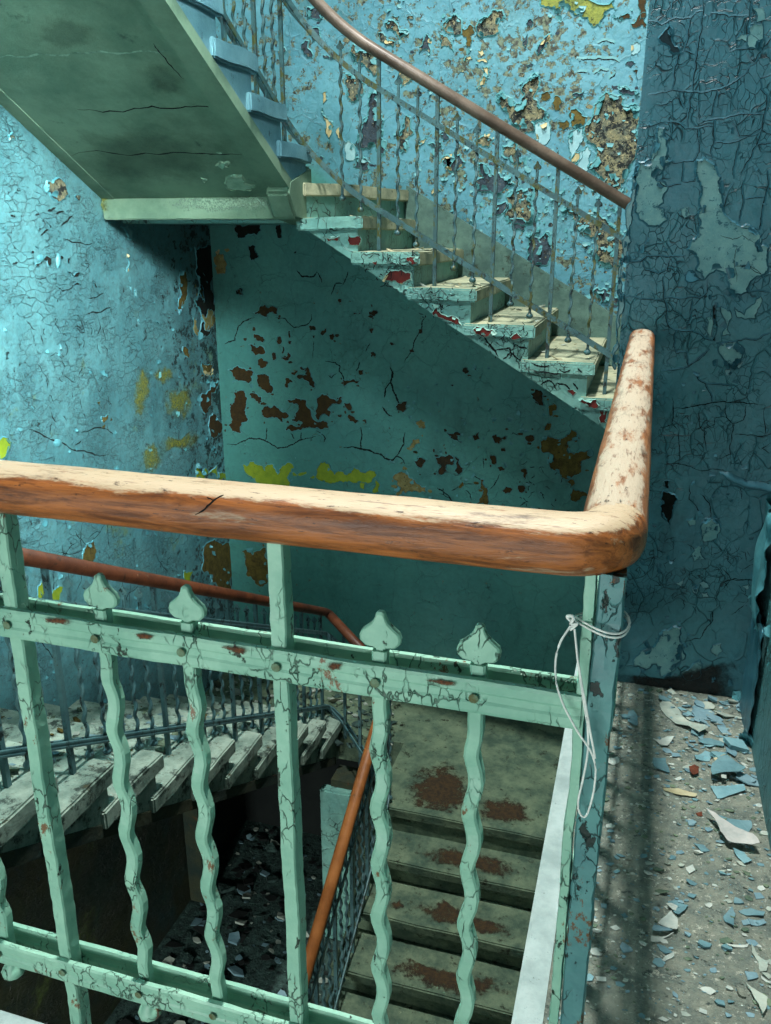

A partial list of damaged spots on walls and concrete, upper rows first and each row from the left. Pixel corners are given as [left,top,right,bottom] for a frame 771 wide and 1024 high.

crack [10,207,113,457]
crack [87,105,208,113]
peeling [182,304,367,440]
crack [225,250,473,464]
peeling [242,419,489,505]
peeling [321,0,674,370]
peeling [444,388,594,502]
crack [478,322,582,390]
crack [625,254,771,514]
crack [647,0,771,293]
peeling [681,156,769,375]
peeling [652,496,771,773]